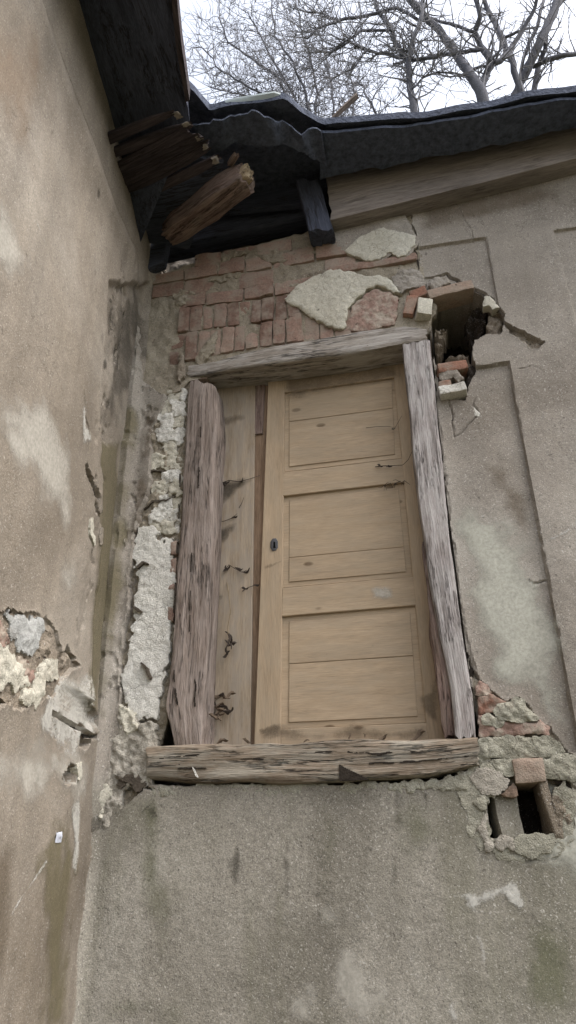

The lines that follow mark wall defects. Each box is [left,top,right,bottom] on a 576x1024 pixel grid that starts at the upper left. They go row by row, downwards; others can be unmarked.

spalling [0,609,97,780]
water stain [61,408,137,709]
spalling [98,215,576,864]